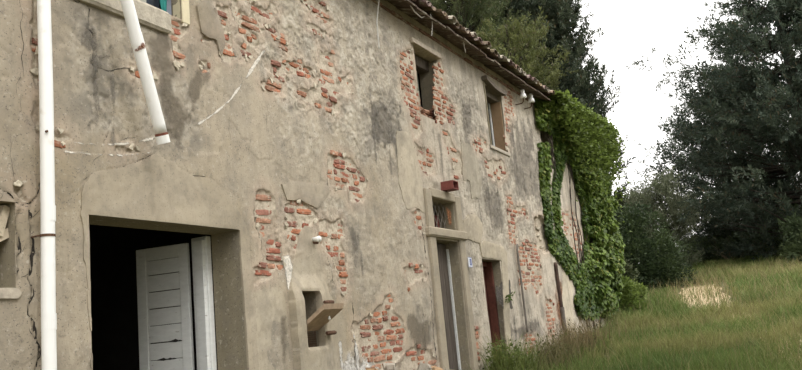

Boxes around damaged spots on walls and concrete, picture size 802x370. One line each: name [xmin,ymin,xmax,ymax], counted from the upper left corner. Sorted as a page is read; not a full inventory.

spalling [216,0,354,115]
spalling [13,179,26,202]
crack [0,140,40,218]
crack [16,236,41,370]
spalling [253,189,348,296]
spalling [327,150,368,203]
water stain [366,94,401,170]
spalling [352,294,438,370]
spalling [398,48,435,176]
spalling [432,59,462,179]
spalling [496,195,557,339]